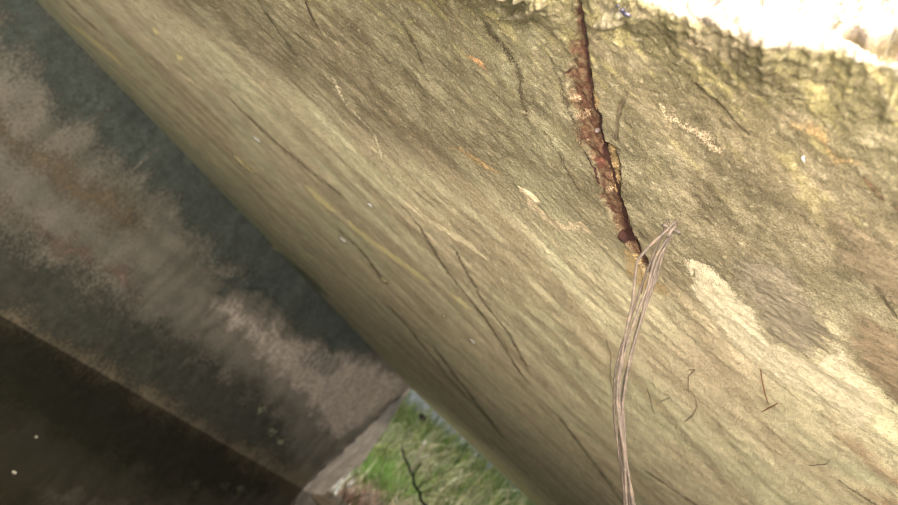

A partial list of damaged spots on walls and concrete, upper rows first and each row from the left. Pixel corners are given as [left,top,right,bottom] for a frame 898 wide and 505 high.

spalling [842,26,898,64]
damp [226,96,433,284]
peeling [517,186,605,237]